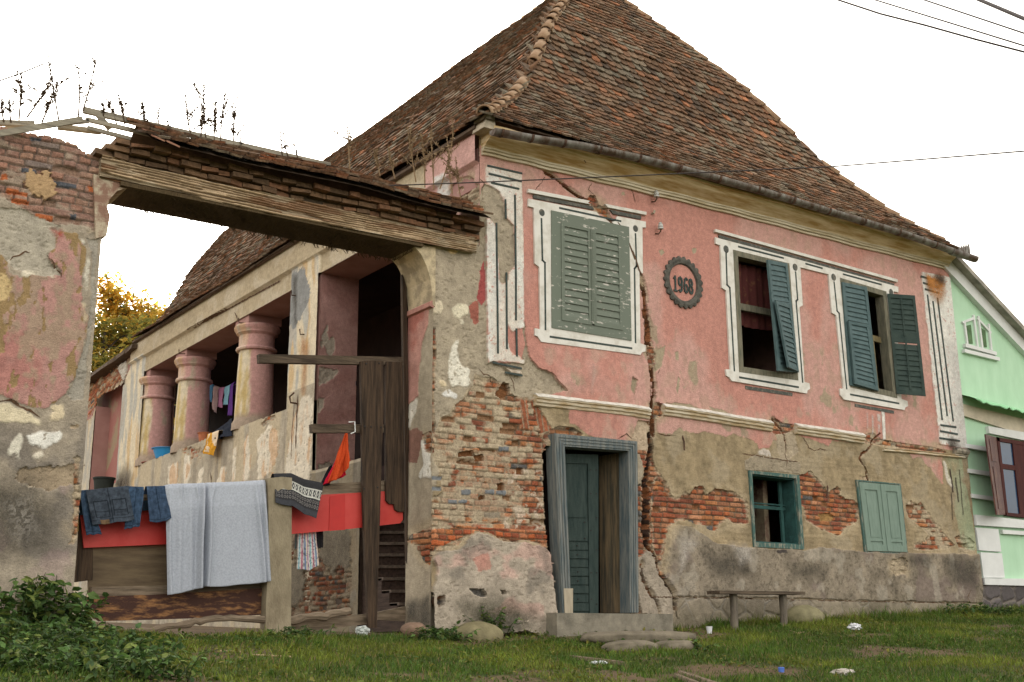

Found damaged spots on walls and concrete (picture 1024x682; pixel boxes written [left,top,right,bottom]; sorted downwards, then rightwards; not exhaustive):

flaking render [0,126,130,544]
peeling [216,325,339,482]
flaking render [407,170,583,566]
flaking render [631,376,749,614]
crack [535,160,971,619]
flaking render [799,470,859,536]
flaking render [890,500,975,575]